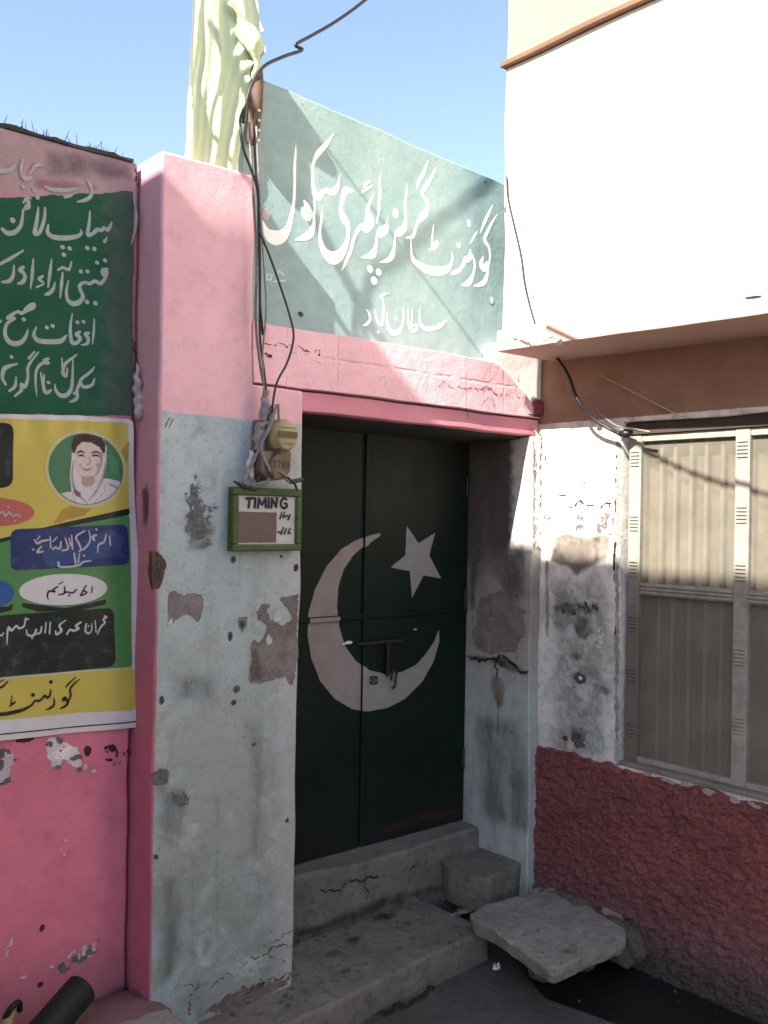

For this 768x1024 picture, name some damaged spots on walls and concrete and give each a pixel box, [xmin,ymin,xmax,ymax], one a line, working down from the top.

water stain [552,534,609,574]
peeling [148,551,207,625]
spalling [471,590,526,656]
peeling [228,594,299,706]
crack [467,655,529,678]
peeling [0,737,34,786]
peeling [44,737,132,773]
crack [314,875,378,896]
peeling [49,939,100,974]
crack [185,929,297,1015]
spalling [205,975,290,1014]